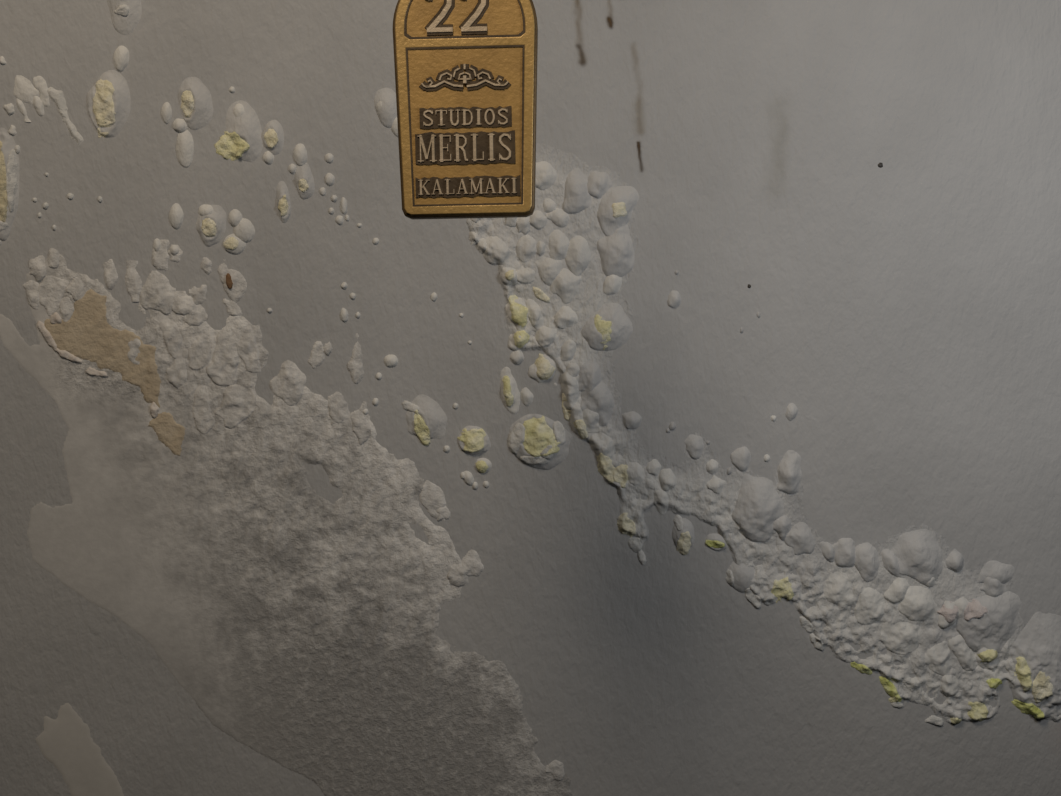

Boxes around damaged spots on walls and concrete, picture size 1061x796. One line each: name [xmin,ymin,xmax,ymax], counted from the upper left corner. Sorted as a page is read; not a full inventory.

peeling [0,240,573,796]